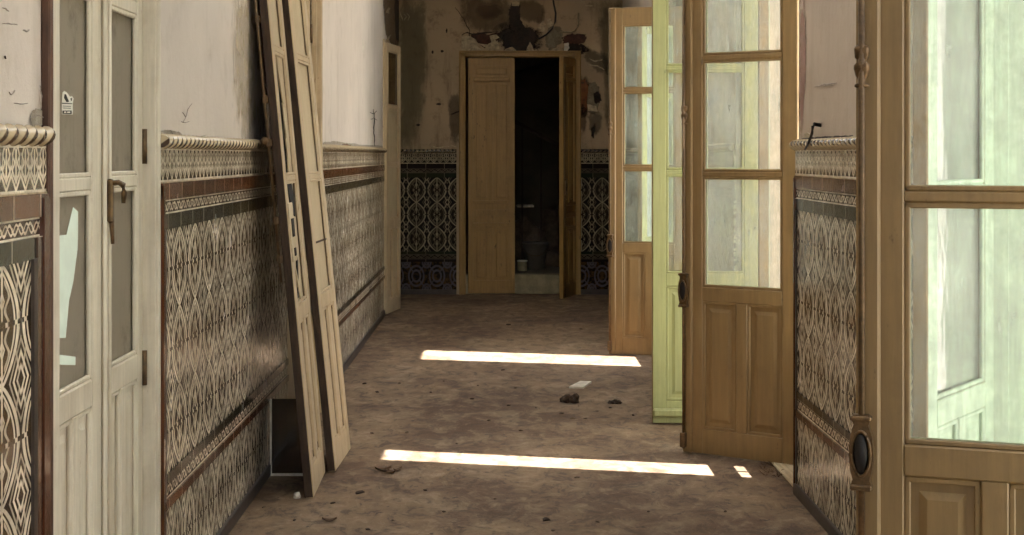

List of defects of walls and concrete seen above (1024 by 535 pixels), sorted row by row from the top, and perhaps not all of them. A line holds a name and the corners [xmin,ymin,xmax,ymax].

spalling [462,0,587,54]
leakage [449,96,459,142]
peeling [587,82,602,138]